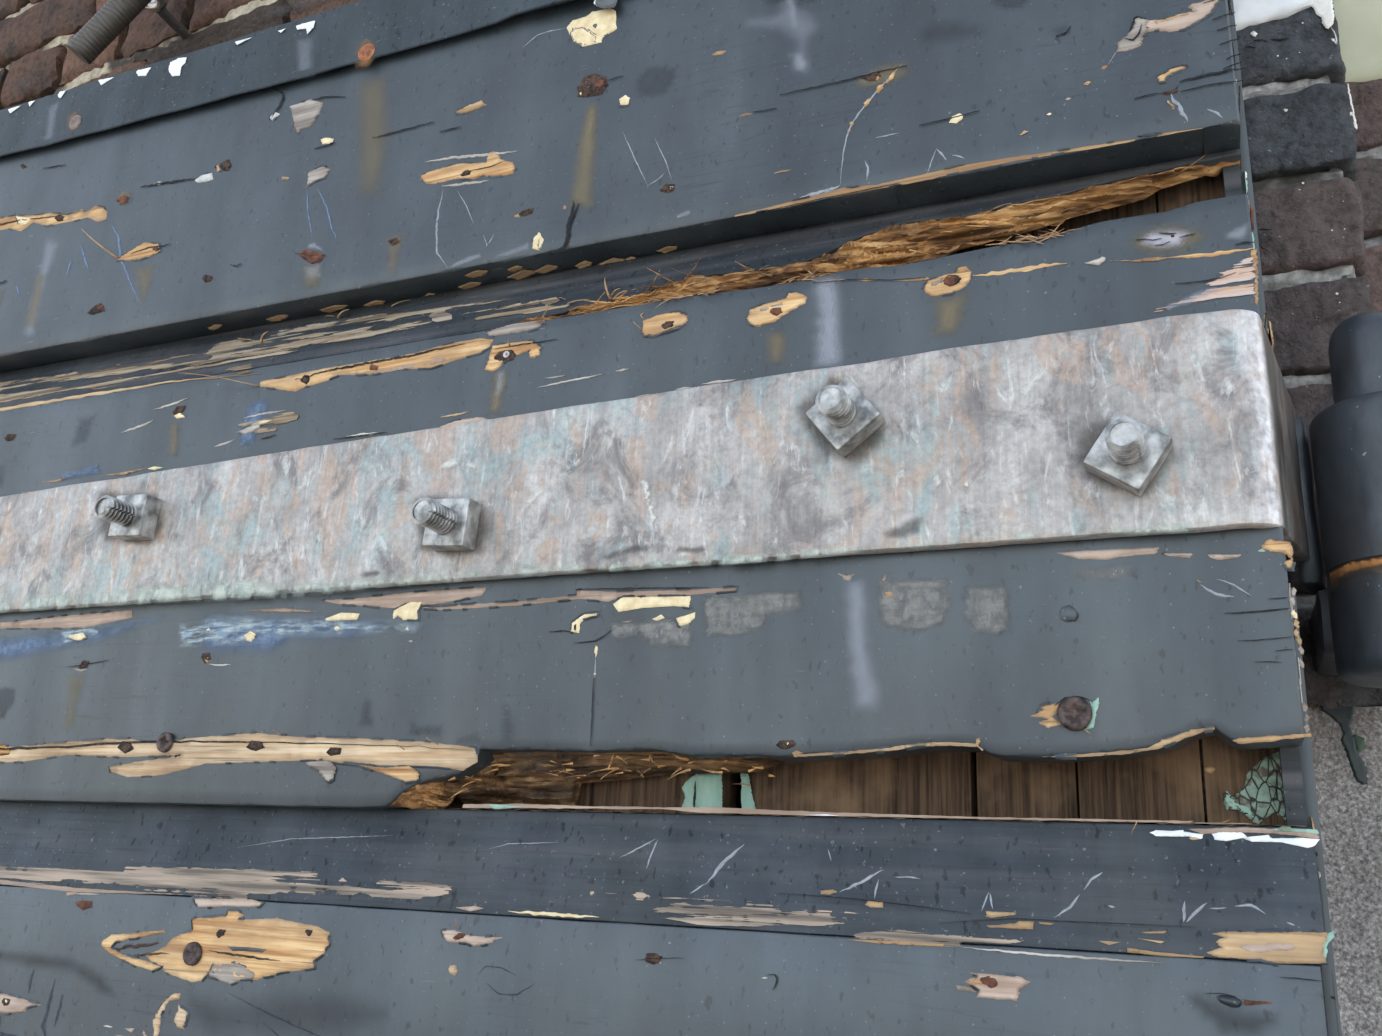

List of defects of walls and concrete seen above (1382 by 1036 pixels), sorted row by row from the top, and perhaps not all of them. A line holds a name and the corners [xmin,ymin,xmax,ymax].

peeling [279,21,315,34]
peeling [1101,0,1223,69]
peeling [169,57,187,76]
crack [540,202,579,254]
spalling [0,64,1259,447]
crack [812,276,929,284]
crack [973,228,1272,276]
rust [1330,558,1382,584]
spalling [0,539,1320,848]
spalling [0,866,503,1036]
peeling [590,890,1335,967]
peeling [956,973,1030,1001]